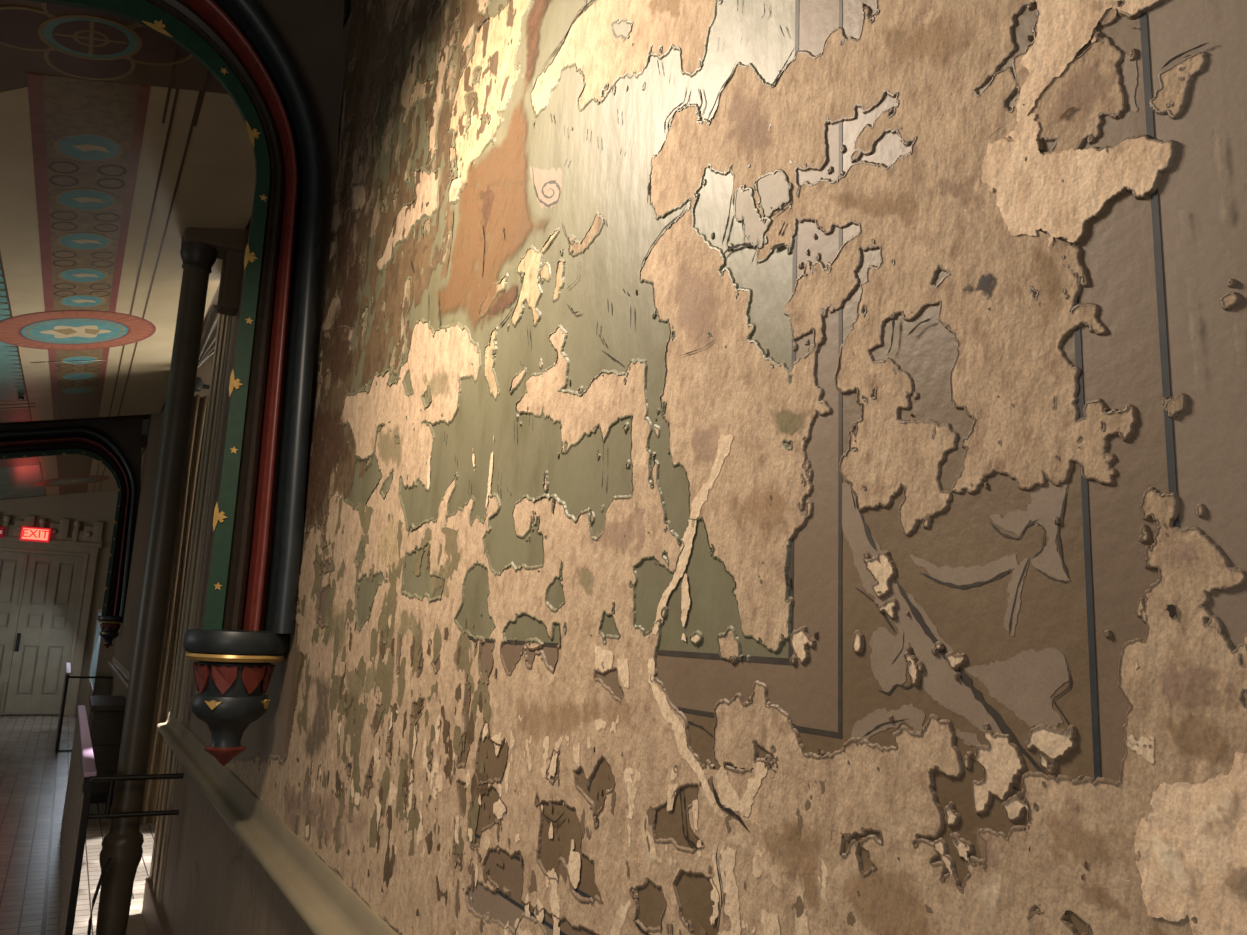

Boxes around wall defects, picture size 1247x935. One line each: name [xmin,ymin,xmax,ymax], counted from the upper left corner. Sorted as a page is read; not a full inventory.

peeling [1149,43,1208,120]
peeling [1220,278,1241,311]
peeling [226,0,1177,935]